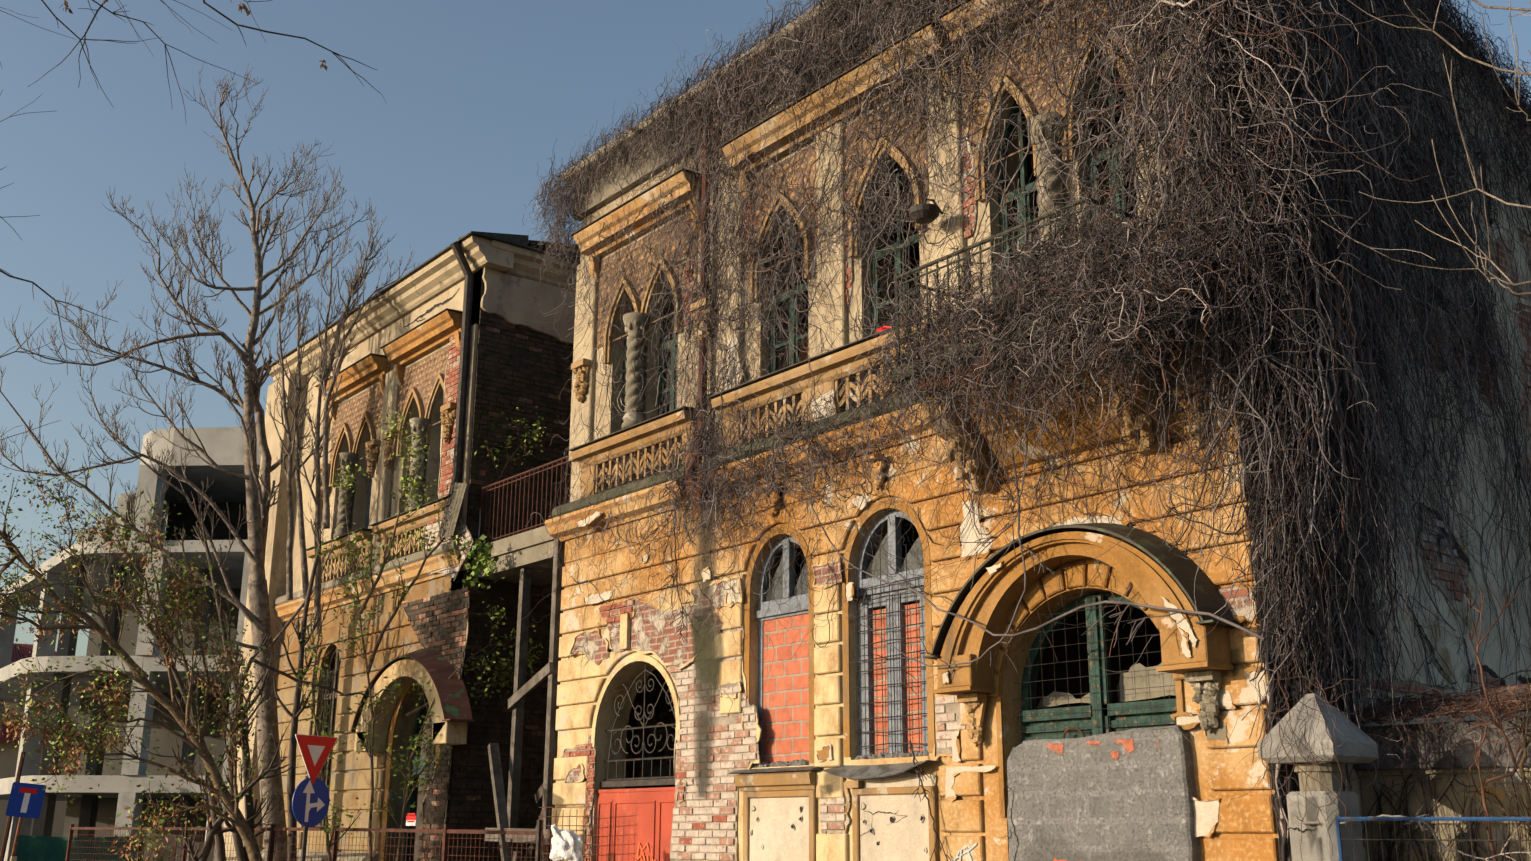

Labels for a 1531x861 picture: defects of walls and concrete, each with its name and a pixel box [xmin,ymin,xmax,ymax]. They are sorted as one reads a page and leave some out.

flaking render [1396,159,1531,488]
flaking render [956,501,1004,576]
flaking render [1418,510,1470,602]
flaking render [1161,597,1198,658]
flaking render [568,566,777,861]
flaking render [561,734,596,861]